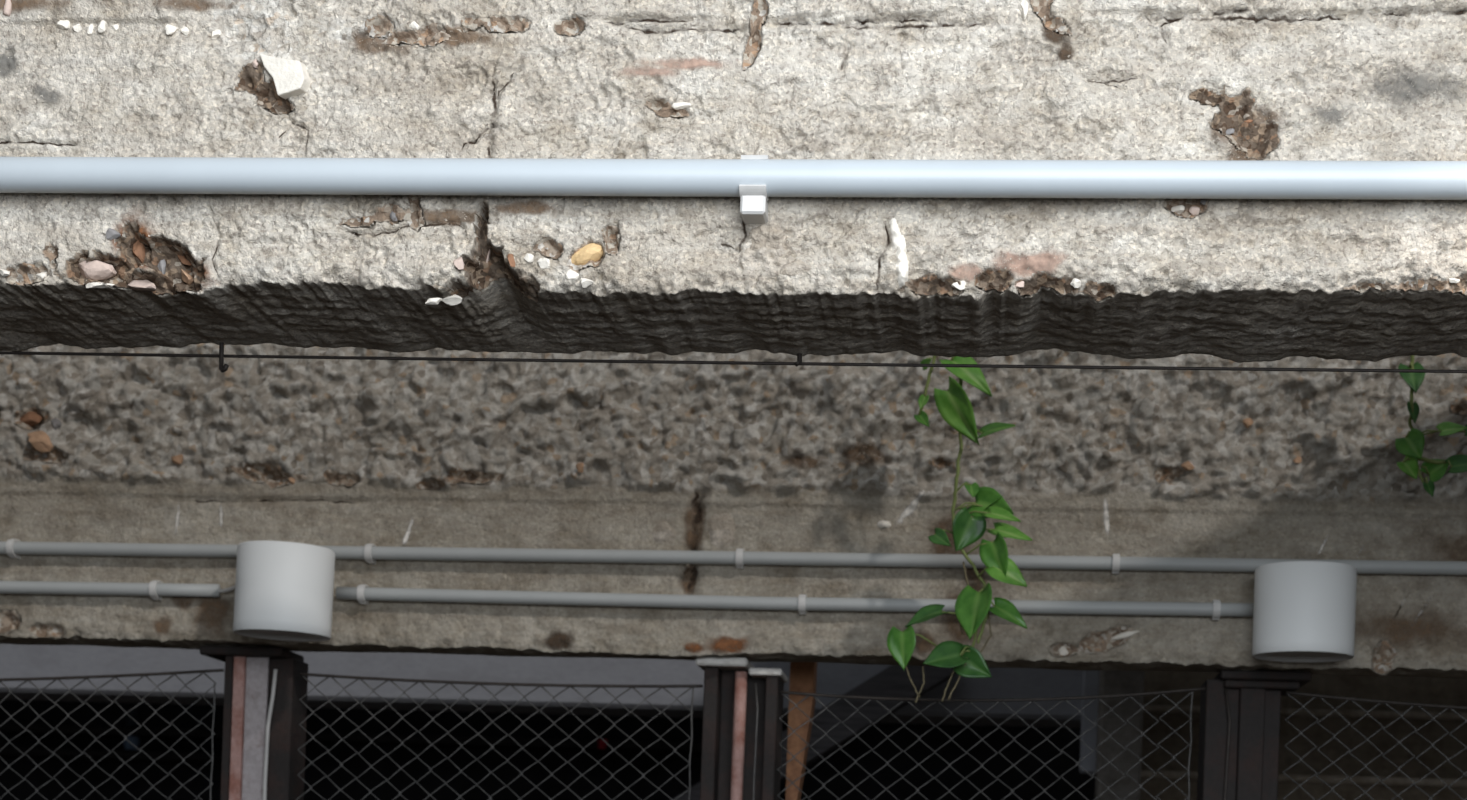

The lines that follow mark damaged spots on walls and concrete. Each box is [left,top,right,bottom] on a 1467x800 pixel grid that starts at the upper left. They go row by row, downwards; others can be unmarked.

crack [462,74,513,157]
spalling [1189,85,1280,160]
spalling [0,220,207,295]
spalling [425,202,619,305]
spalling [899,268,1117,301]
spalling [1343,273,1467,296]